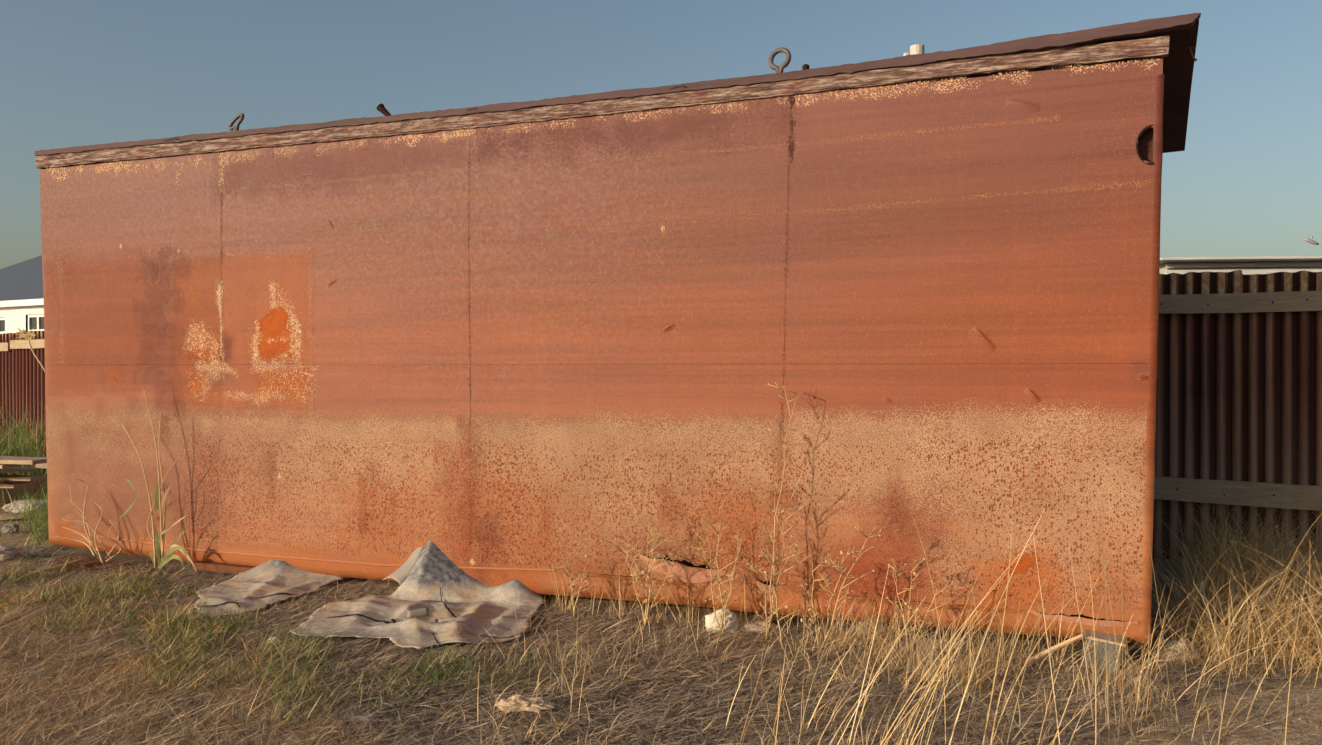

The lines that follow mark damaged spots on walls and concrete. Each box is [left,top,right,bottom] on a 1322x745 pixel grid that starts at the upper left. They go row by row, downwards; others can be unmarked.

peeling [1052,58,1159,76]
peeling [593,70,1034,122]
peeling [314,118,576,156]
peeling [46,145,298,185]
peeling [181,280,319,409]
corrosion [680,427,946,619]
corrosion [169,540,410,577]
corrosion [457,560,543,592]
corrosion [965,546,1067,622]